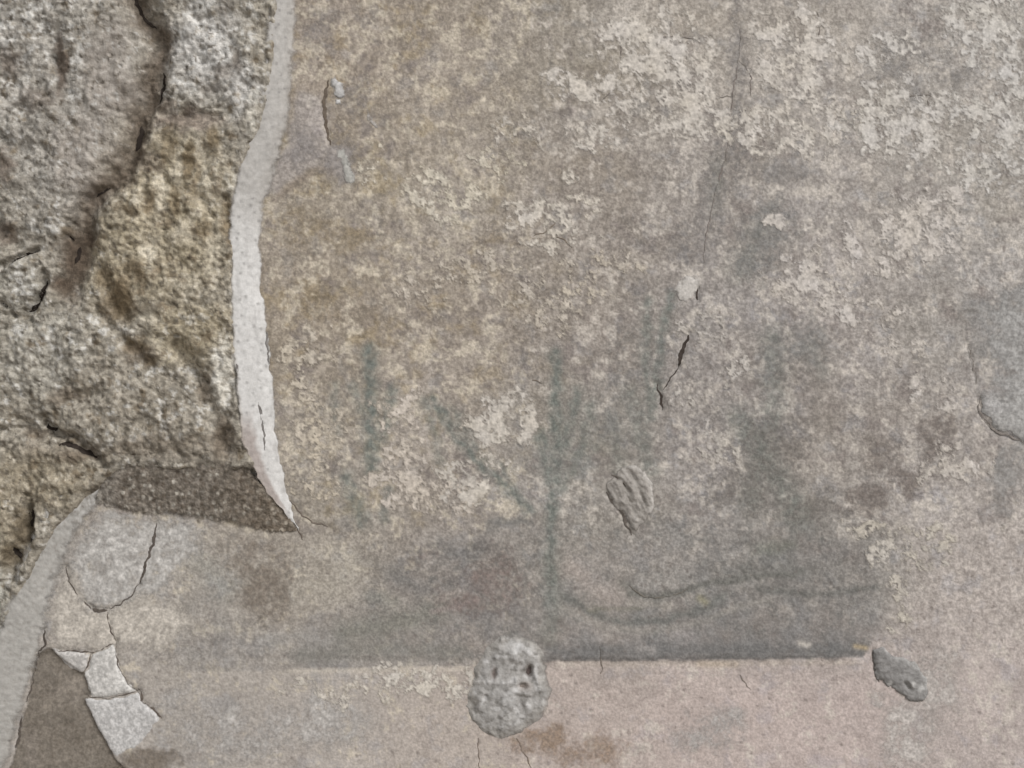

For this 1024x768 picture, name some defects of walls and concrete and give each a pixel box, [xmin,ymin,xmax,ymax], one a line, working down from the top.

spalling [0,0,277,628]
crack [657,335,689,408]
crack [968,346,1024,443]
spalling [10,511,198,768]